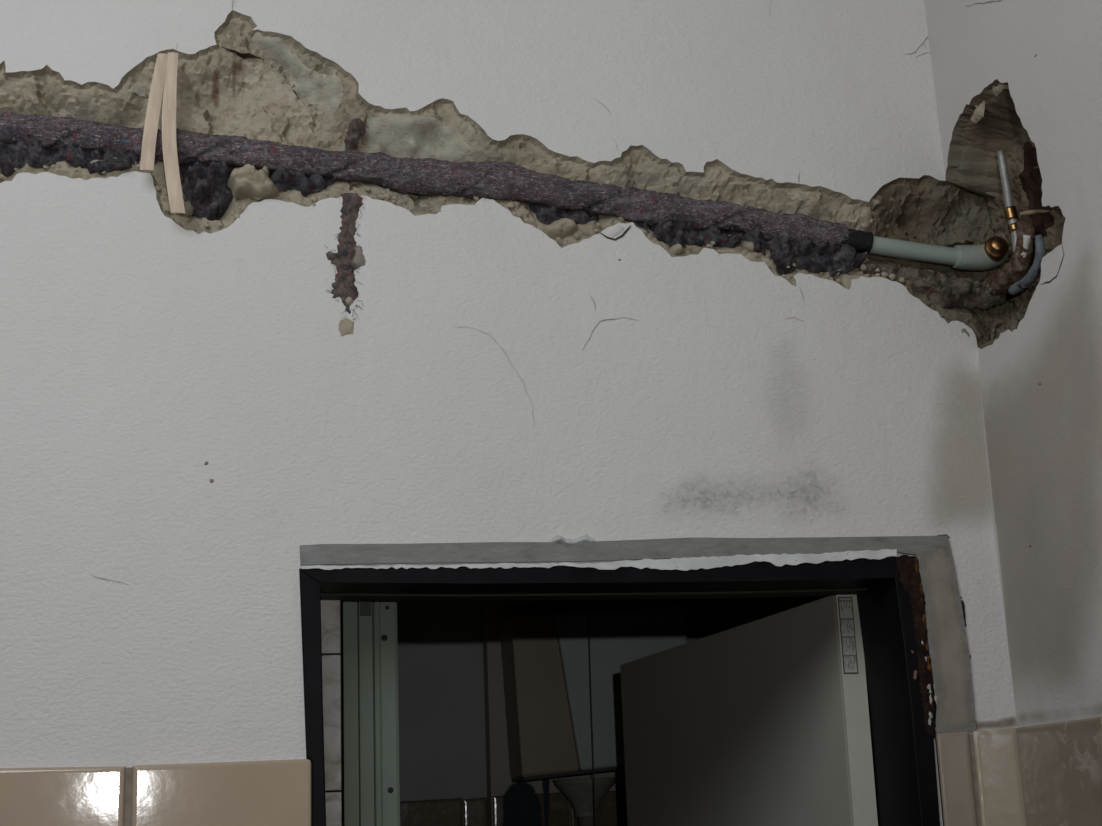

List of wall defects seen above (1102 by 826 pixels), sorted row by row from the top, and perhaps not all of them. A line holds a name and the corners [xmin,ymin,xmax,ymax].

spalling [0,10,1066,349]
crack [455,326,535,421]
crack [583,295,635,349]
corrosion [896,554,938,738]